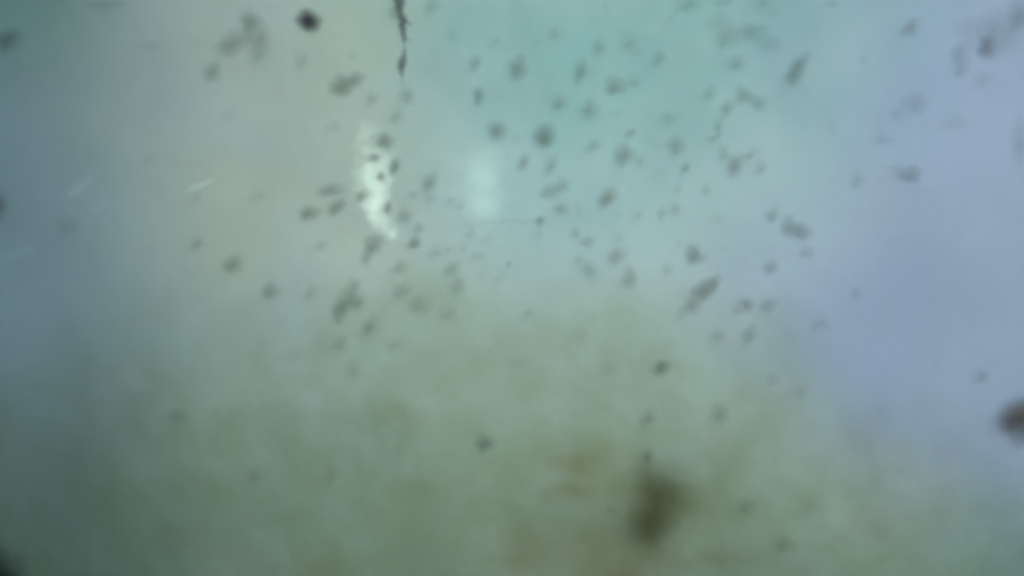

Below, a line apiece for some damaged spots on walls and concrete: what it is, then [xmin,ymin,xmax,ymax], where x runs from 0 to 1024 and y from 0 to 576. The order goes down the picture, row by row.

mould [302,12,317,27]
crack [396,0,406,35]